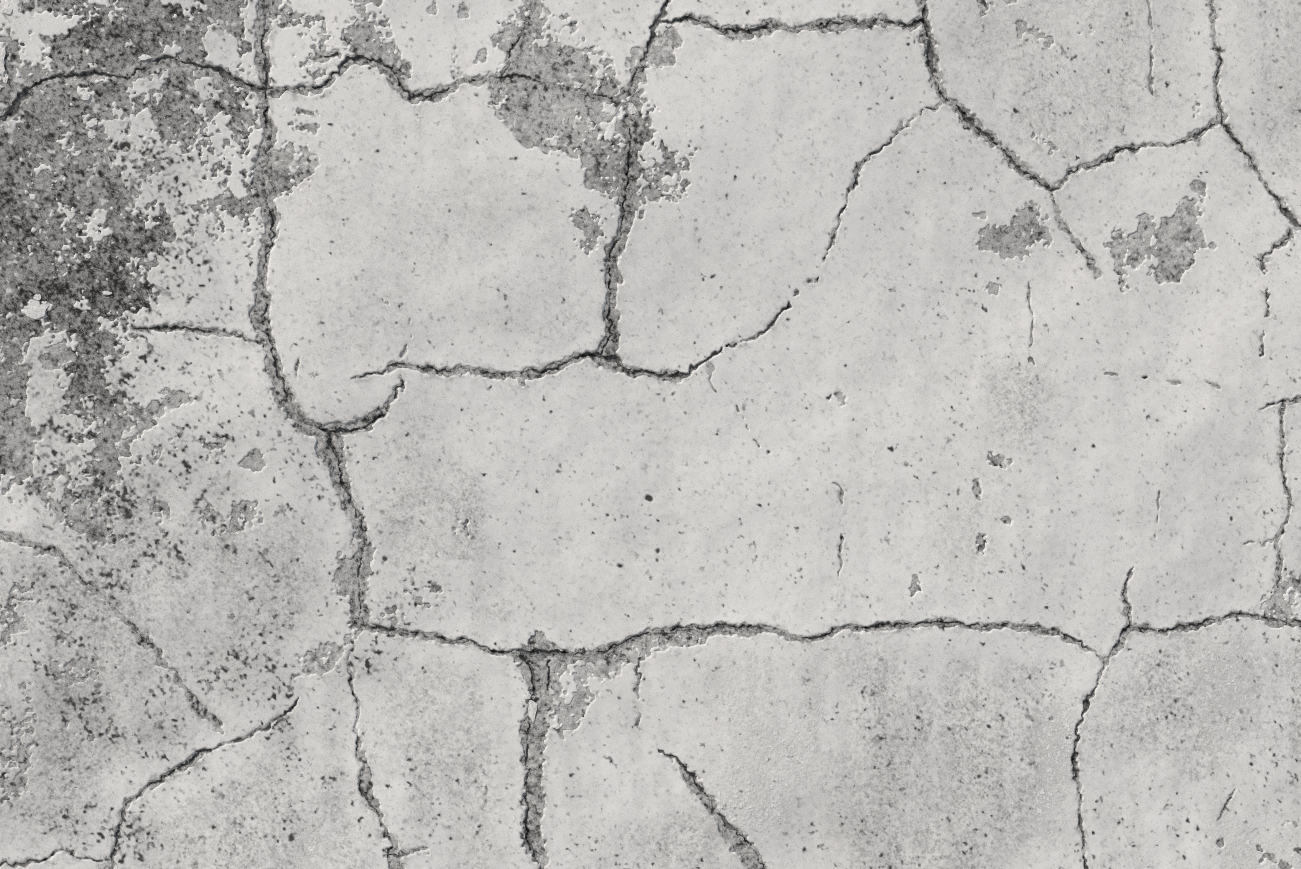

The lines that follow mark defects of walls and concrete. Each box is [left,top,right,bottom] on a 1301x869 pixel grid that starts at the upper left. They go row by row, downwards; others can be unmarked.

flaking render [0,0,279,546]
flaking render [271,108,320,198]
flaking render [451,0,698,220]
flaking render [571,206,613,255]
crack [0,0,1301,652]
flaking render [985,282,999,295]
flaking render [972,201,1053,261]
flaking render [1103,180,1217,293]
crack [0,530,299,869]
crack [347,657,429,869]
crack [364,567,1301,869]